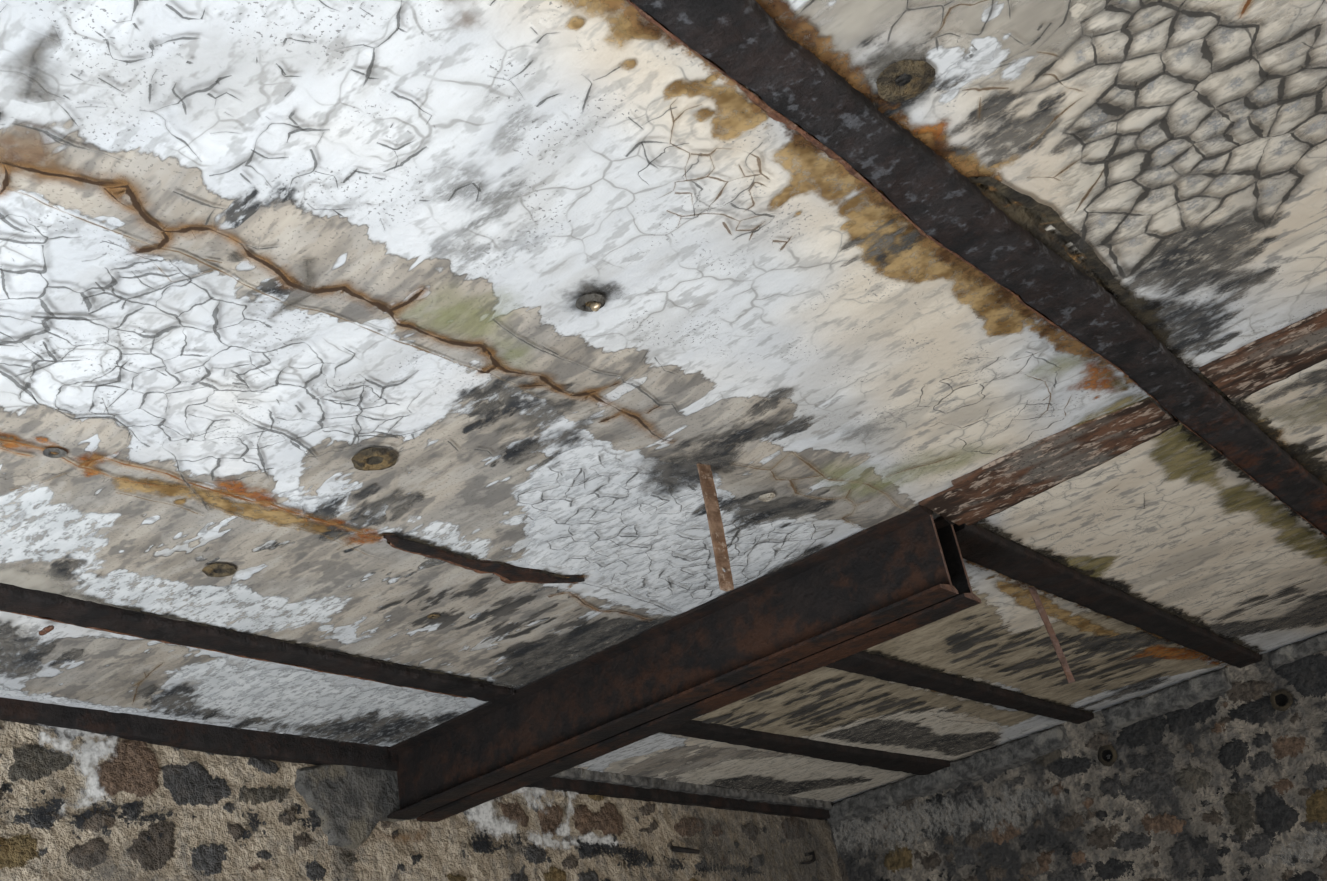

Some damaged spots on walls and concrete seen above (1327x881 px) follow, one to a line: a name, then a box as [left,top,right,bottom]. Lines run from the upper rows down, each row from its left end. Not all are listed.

crack [0,0,680,557]
crack [625,100,792,251]
rust [563,0,1149,400]
water stain [839,219,922,267]
water stain [942,93,1107,166]
crack [888,0,1327,279]
rust [114,477,583,590]
peeling [0,377,819,685]
water stain [453,372,594,469]
water stain [647,388,813,494]
crack [517,351,1071,621]
rust [966,560,1120,639]